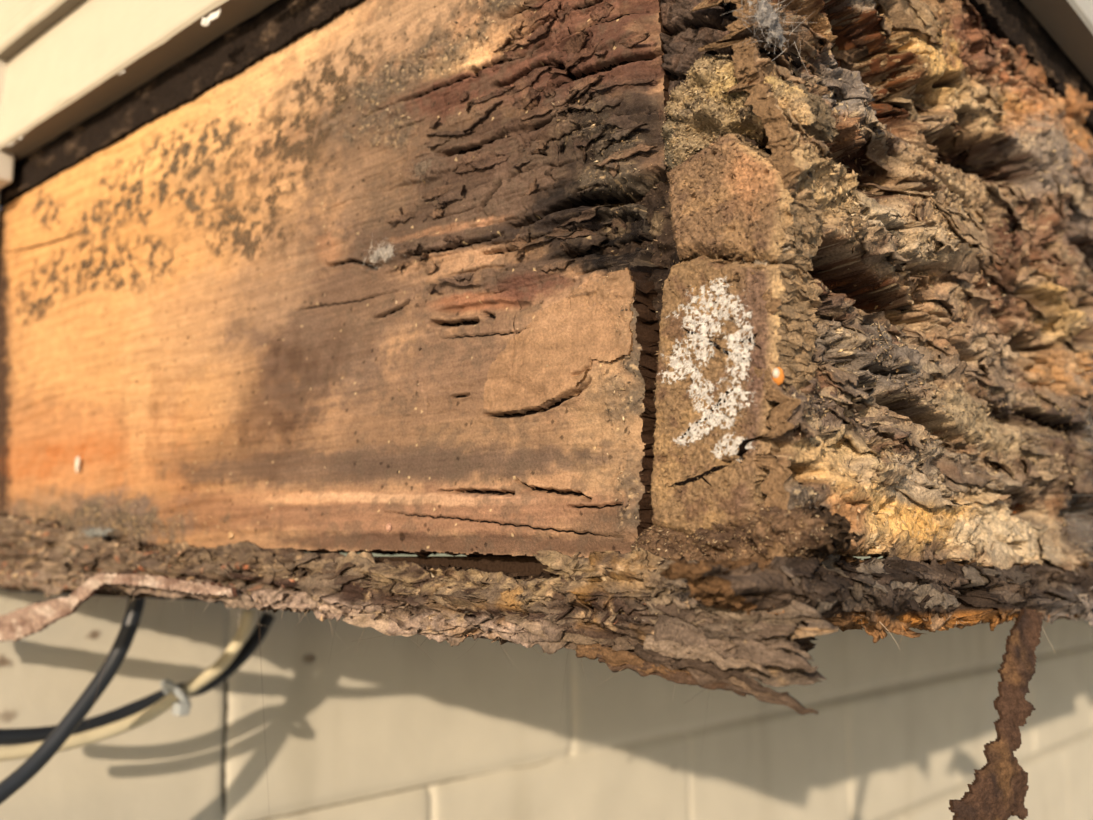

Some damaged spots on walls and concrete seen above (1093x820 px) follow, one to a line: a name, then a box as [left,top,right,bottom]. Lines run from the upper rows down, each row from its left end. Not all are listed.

crack [365,4,653,162]
spalling [812,0,922,121]
mould [17,44,372,323]
spalling [935,149,1025,185]
crack [405,199,634,260]
hole [1074,239,1093,273]
crack [300,260,408,318]
crack [438,303,526,339]
crack [493,392,582,418]
crack [387,483,623,538]
peeling [0,573,238,642]
peeling [948,608,1043,820]